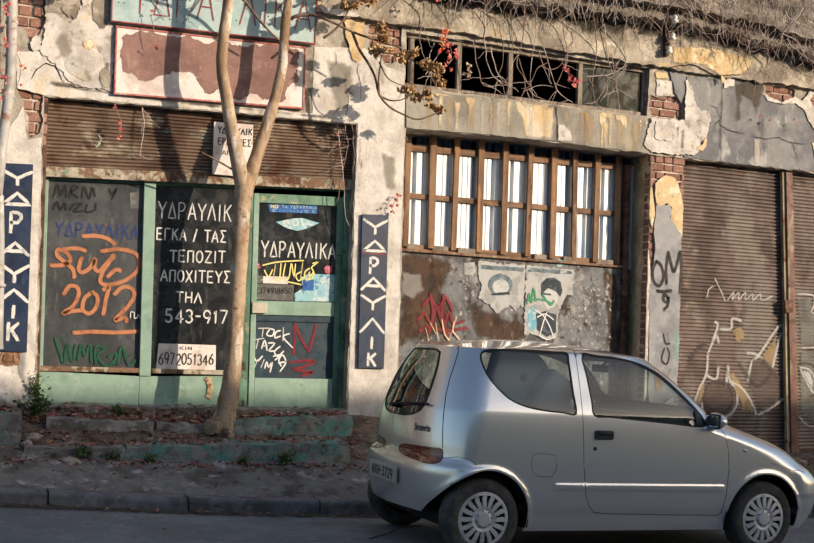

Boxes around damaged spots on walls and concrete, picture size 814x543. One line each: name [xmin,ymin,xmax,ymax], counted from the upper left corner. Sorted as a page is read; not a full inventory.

flaking render [17,0,115,91]
flaking render [320,7,402,65]
flaking render [17,89,48,145]
crack [32,63,101,91]
water stain [430,93,553,138]
water stain [589,112,647,147]
flaking render [643,46,757,156]
crack [673,64,740,85]
crack [710,105,799,160]
flaking render [765,85,814,128]
flaking render [643,175,684,406]